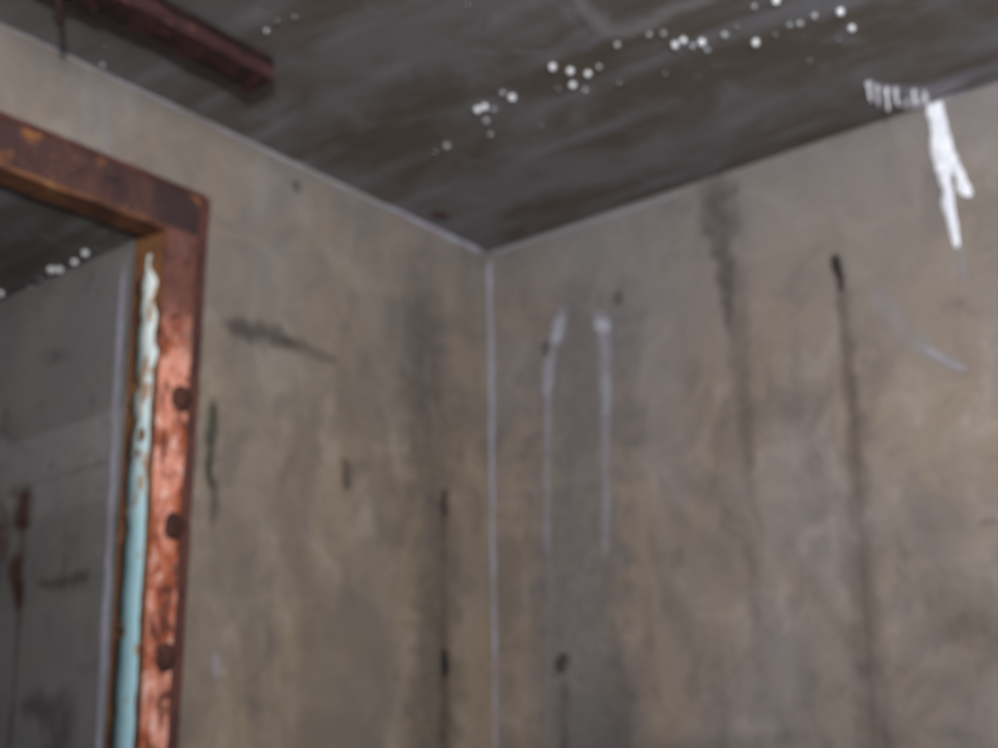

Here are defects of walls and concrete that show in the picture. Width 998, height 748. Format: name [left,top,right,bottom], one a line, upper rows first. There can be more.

rust [0,111,211,748]
damp [0,23,678,748]
damp [864,81,973,249]